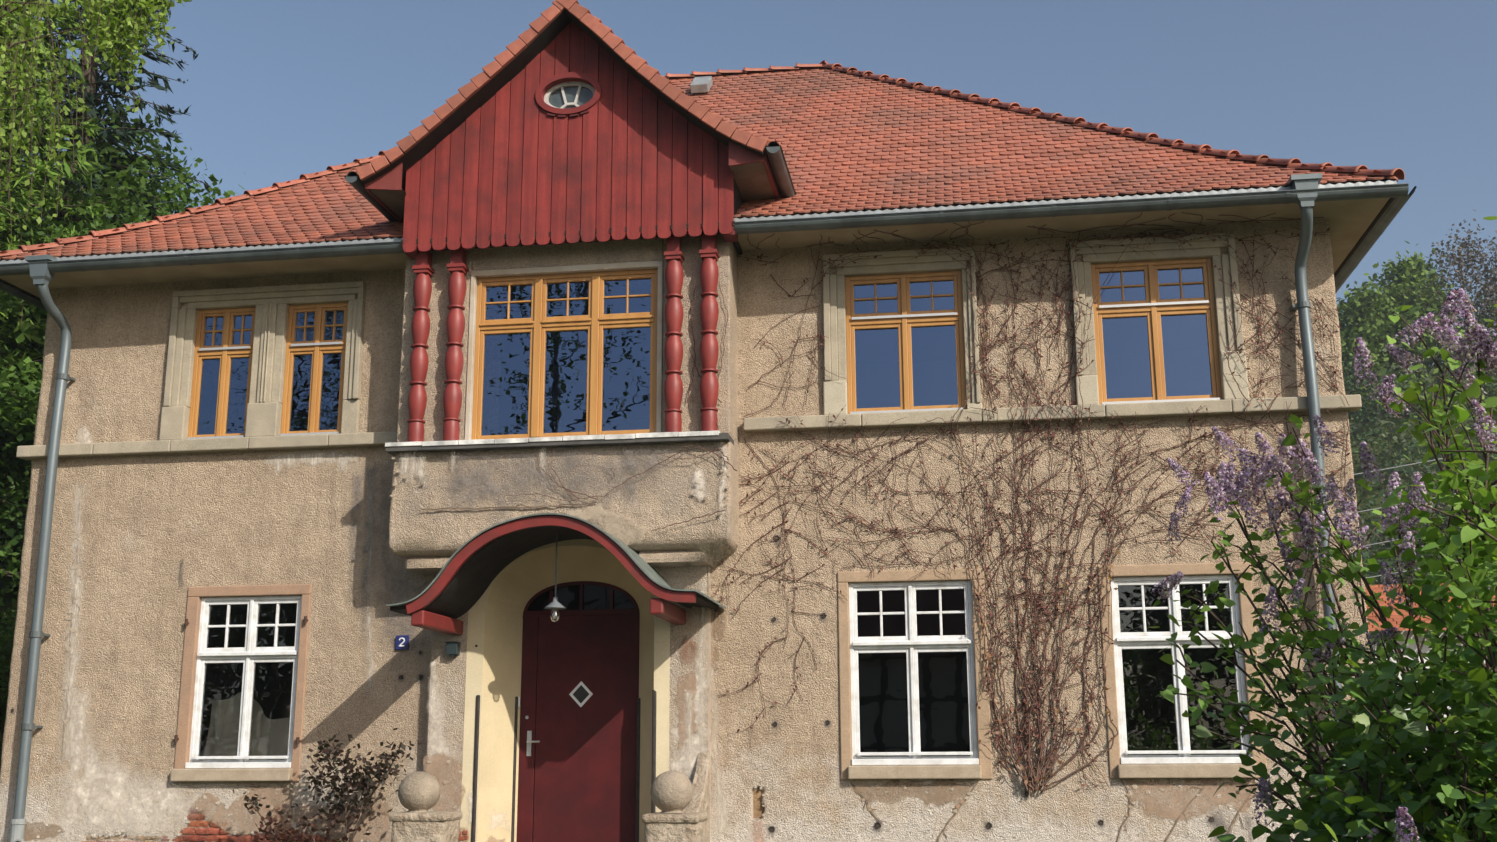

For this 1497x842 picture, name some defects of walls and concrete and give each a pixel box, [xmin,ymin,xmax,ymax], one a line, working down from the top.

flaking render [692,445,729,514]
flaking render [24,786,391,842]